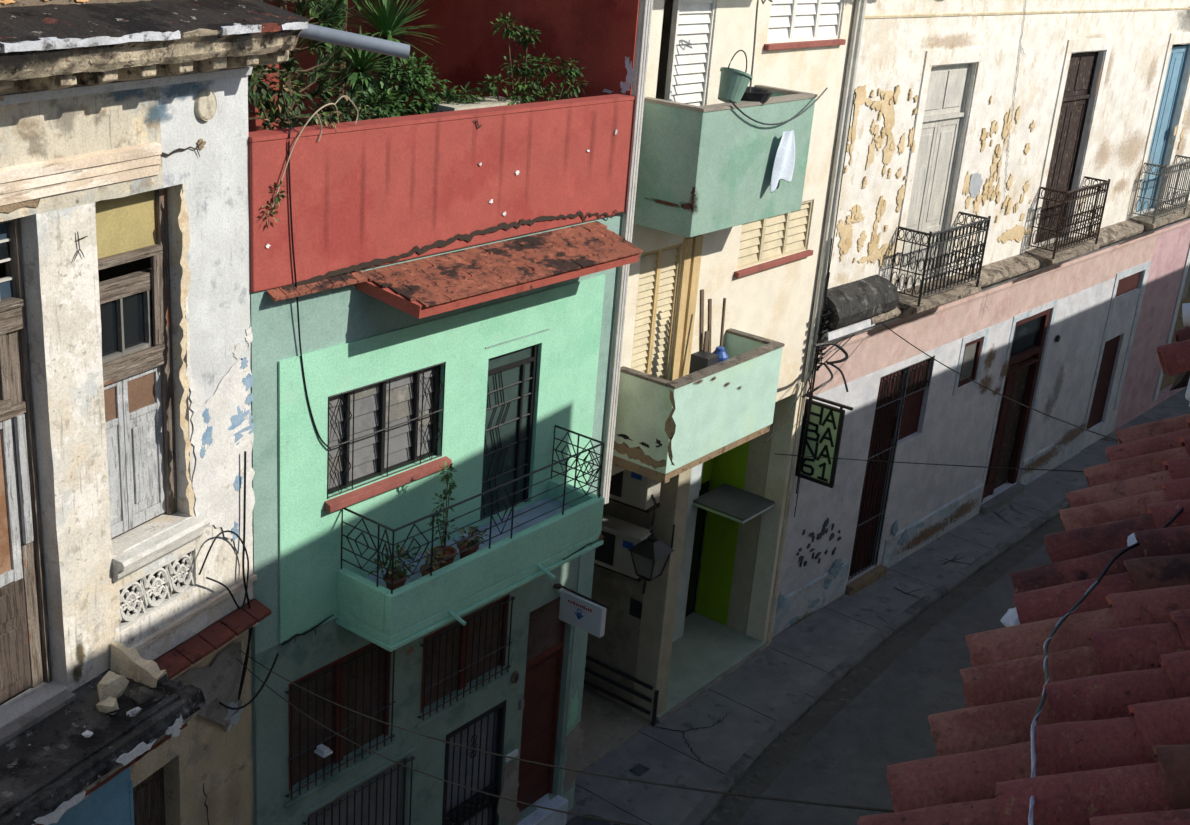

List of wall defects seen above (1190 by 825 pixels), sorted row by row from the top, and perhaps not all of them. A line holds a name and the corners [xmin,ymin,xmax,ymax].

rust [645,187,698,214]
peeling [836,85,918,269]
peeling [963,105,1036,243]
peeling [178,189,255,553]
flaking render [613,390,676,469]
peeling [776,518,844,626]
peeling [116,716,184,766]
peeling [32,791,86,825]
crack [202,783,210,825]